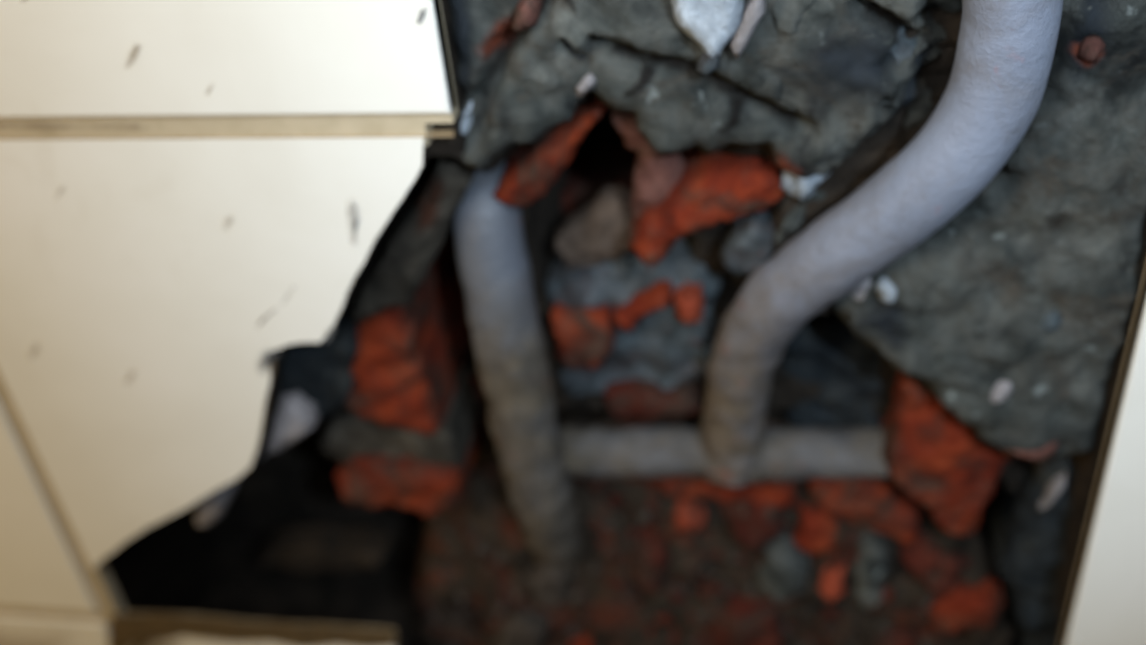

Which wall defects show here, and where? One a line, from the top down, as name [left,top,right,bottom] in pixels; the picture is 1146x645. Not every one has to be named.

spalling [0,0,962,569]
spalling [655,0,1146,645]
spalling [122,612,398,645]